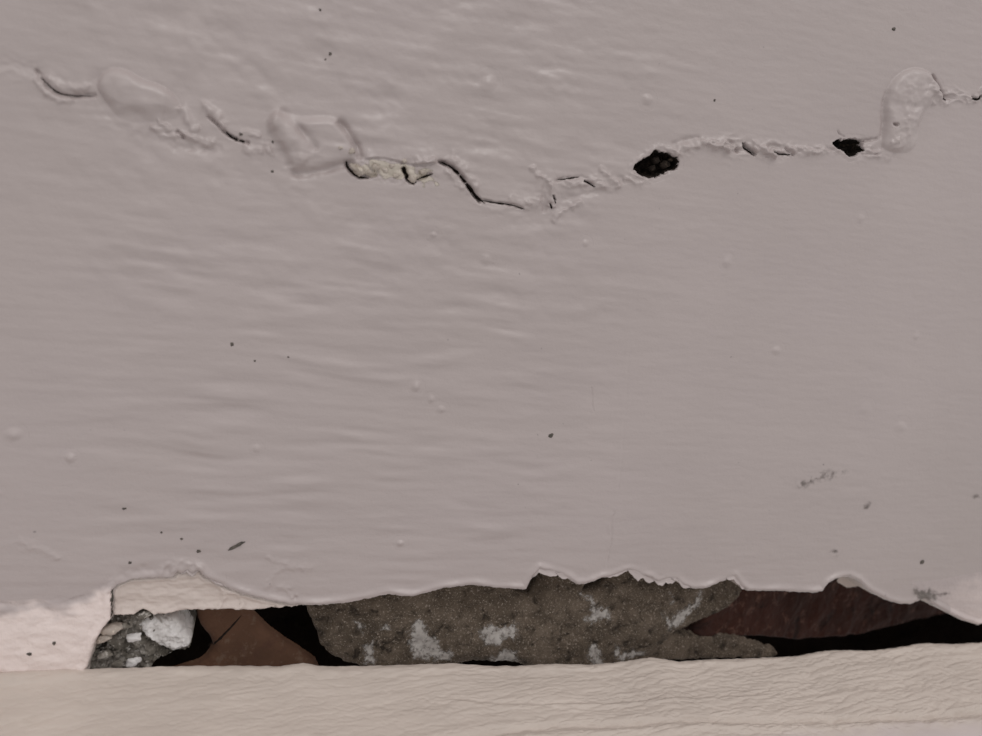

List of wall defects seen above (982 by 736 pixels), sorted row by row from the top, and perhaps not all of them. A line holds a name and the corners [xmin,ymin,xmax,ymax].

crack [0,40,279,173]
crack [931,74,982,118]
hole [832,139,865,157]
crack [310,122,902,233]
hole [633,150,679,178]
peeling [532,569,572,581]
peeling [608,569,691,588]
spalling [837,576,885,600]